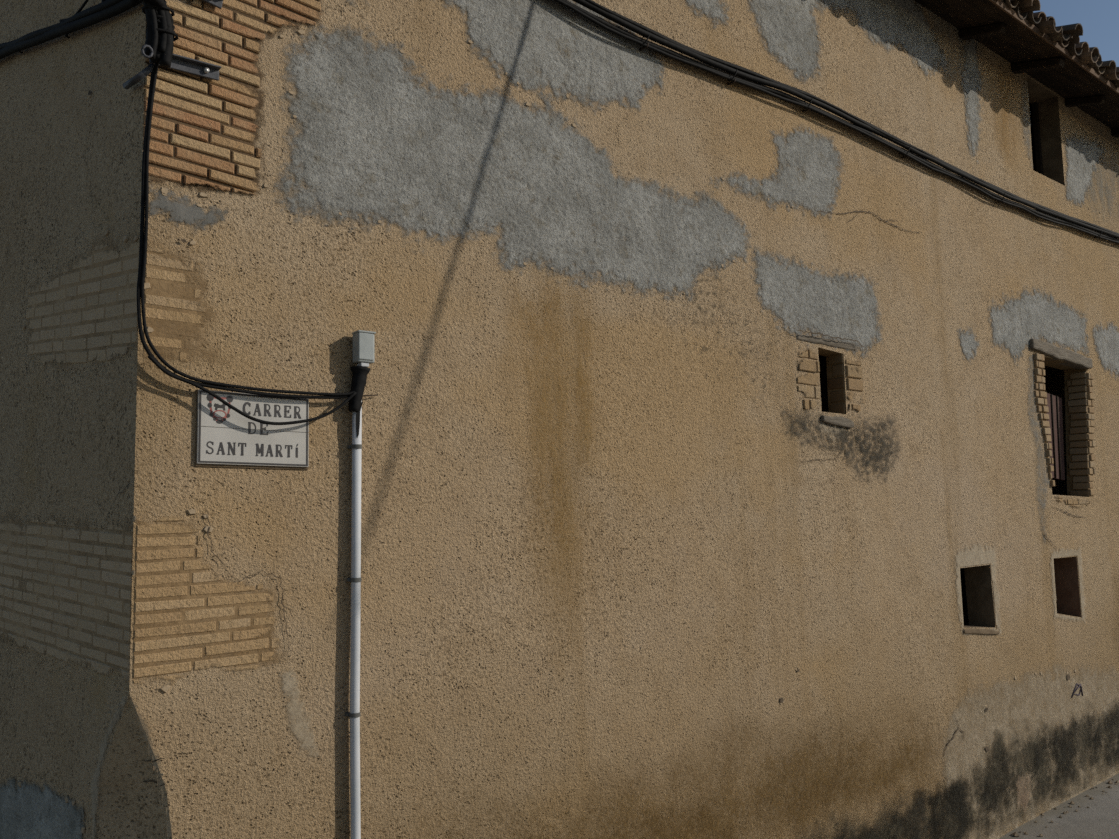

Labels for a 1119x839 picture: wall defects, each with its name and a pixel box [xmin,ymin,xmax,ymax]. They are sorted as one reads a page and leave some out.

flaking render [749,0,946,81]
flaking render [22,0,883,371]
flaking render [989,289,1119,508]
flaking render [0,508,279,693]
flaking render [0,779,85,839]
flaking render [283,672,318,755]
water stain [617,710,1119,839]
flaking render [944,666,1119,839]